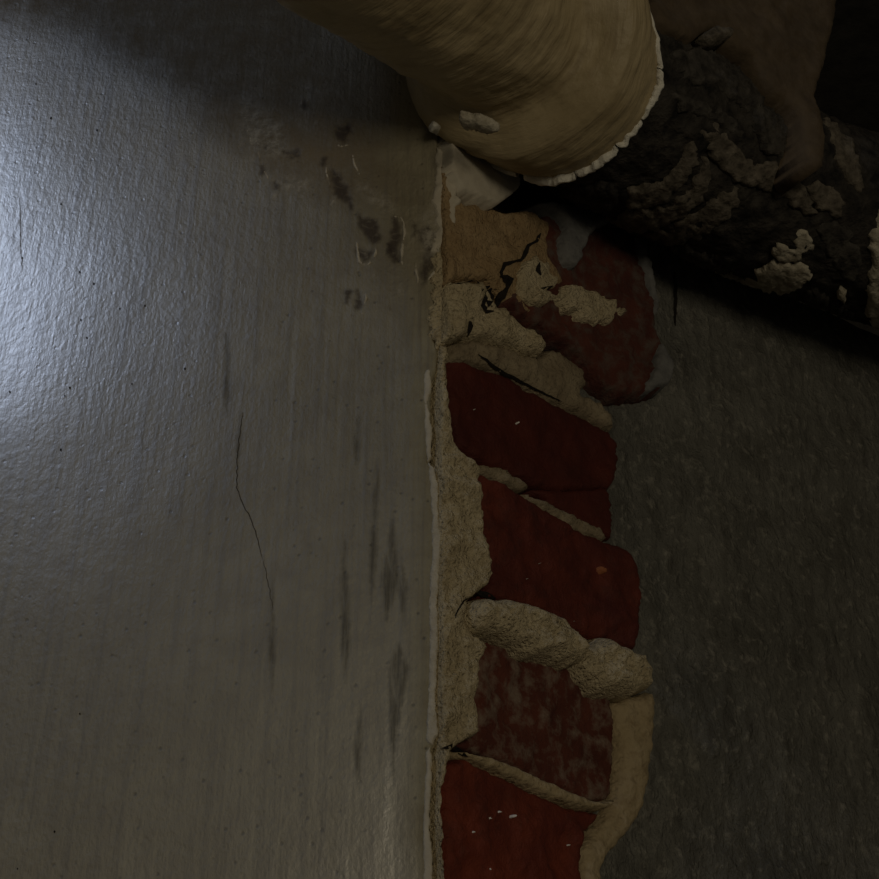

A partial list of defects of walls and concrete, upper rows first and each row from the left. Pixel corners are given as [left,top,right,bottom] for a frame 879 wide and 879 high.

crack [452,233,562,402]
crack [236,415,273,607]
flaking render [414,11,664,879]